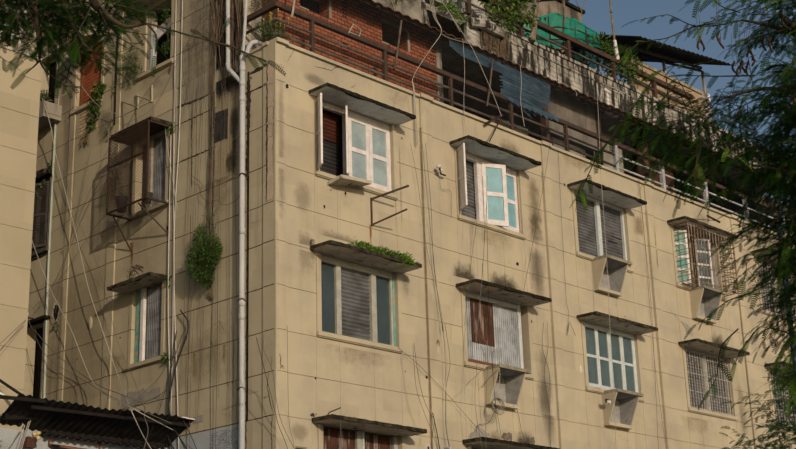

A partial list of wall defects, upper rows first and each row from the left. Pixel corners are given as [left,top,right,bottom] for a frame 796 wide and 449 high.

water stain [177,64,266,230]
water stain [456,268,475,280]